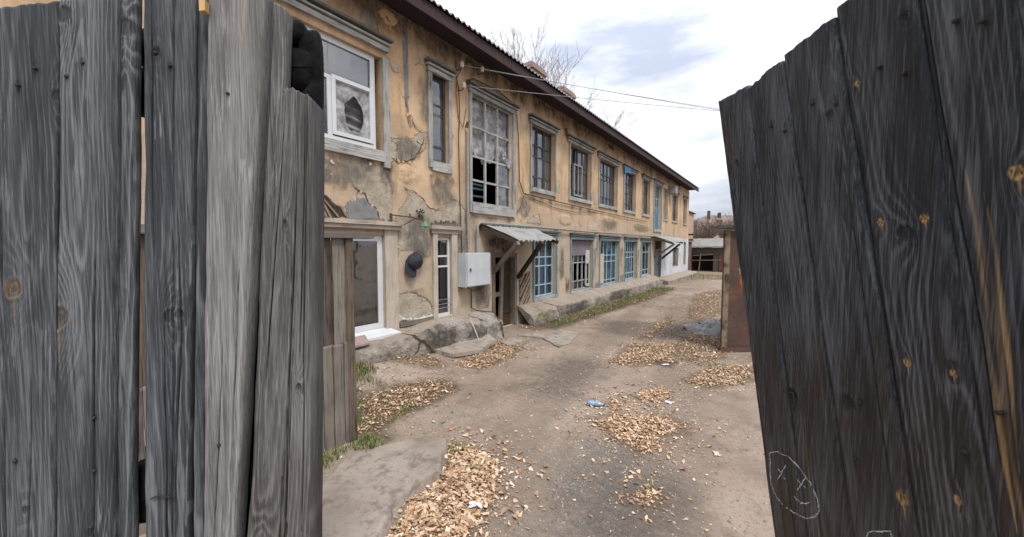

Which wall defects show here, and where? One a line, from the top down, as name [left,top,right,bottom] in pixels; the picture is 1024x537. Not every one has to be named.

flaking render [324,17,467,258]
flaking render [399,291,433,322]